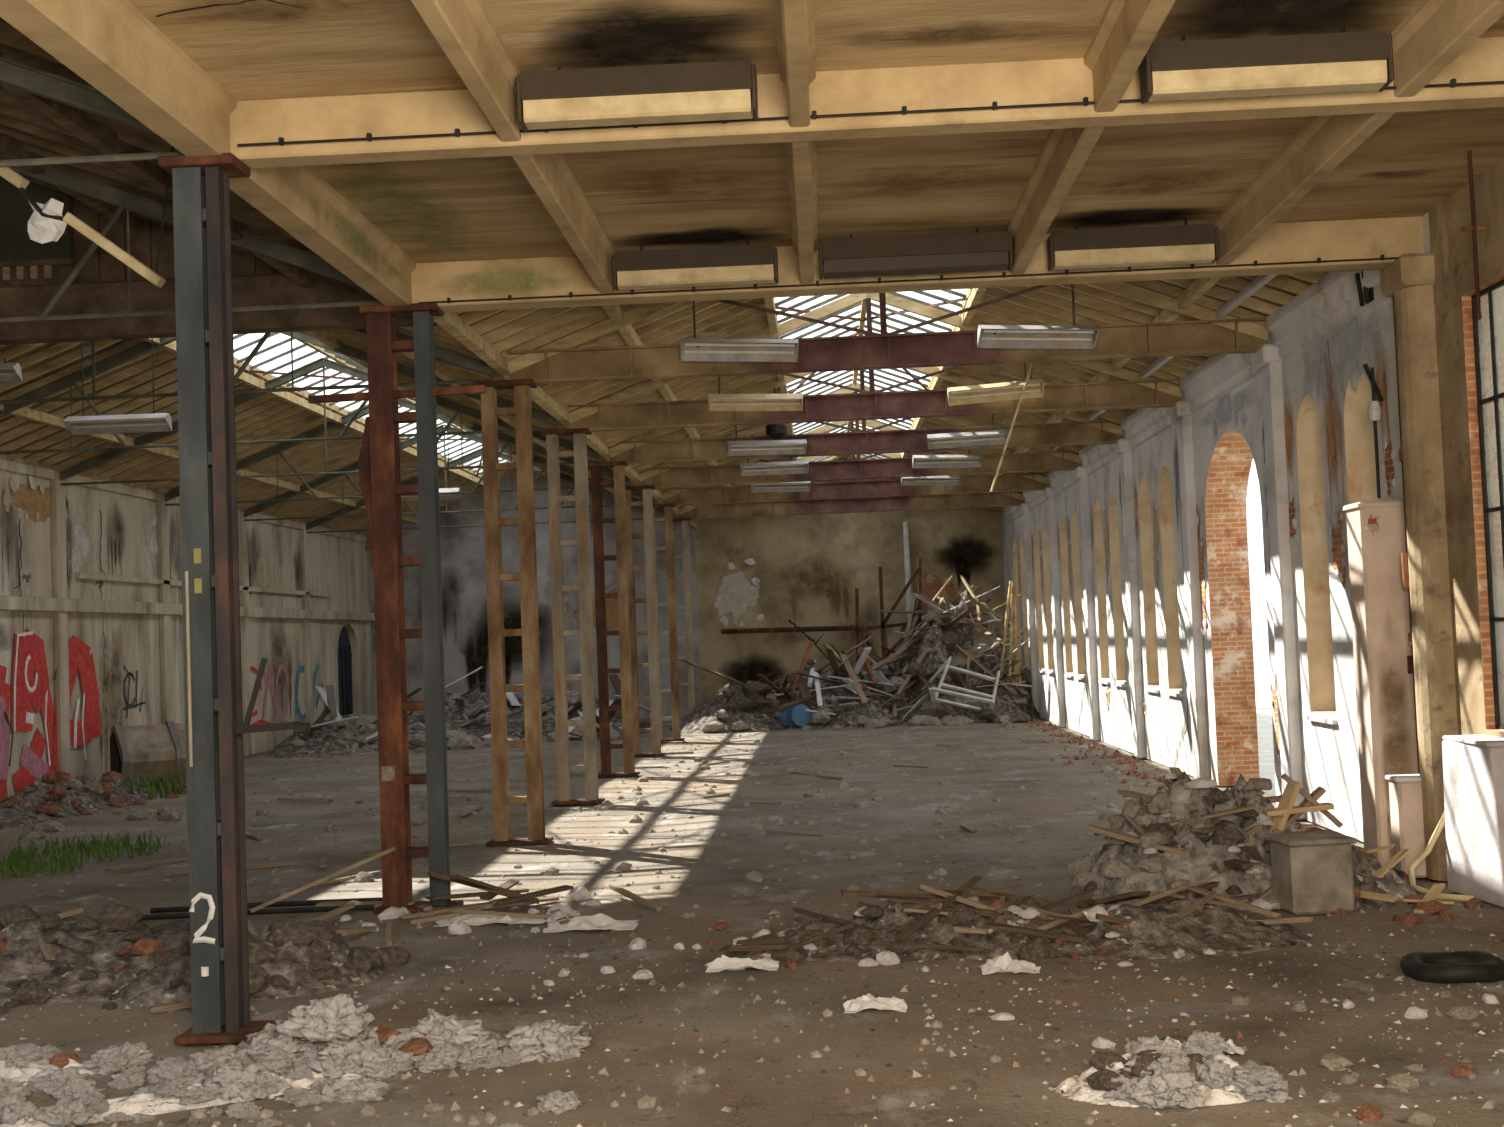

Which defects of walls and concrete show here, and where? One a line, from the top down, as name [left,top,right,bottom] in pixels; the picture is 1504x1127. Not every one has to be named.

peeling [2,476,73,522]
peeling [713,558,764,627]
water stain [956,556,970,586]